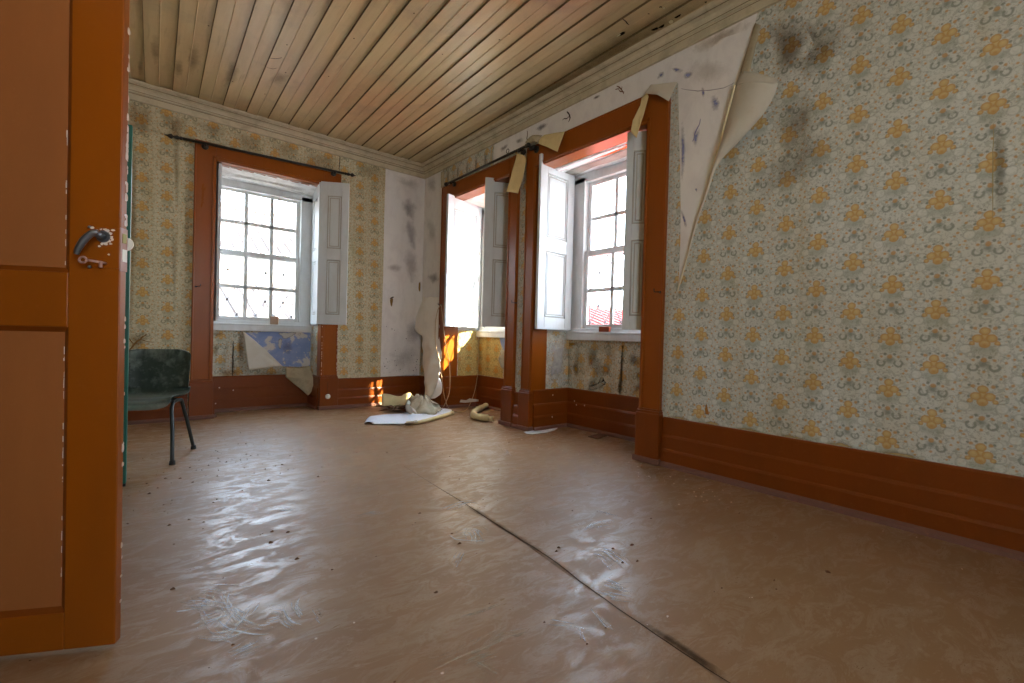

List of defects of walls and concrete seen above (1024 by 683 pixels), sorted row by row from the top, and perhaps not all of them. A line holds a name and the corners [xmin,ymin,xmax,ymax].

flaking render [493,13,757,285]
flaking render [246,332,322,375]
flaking render [381,169,442,377]